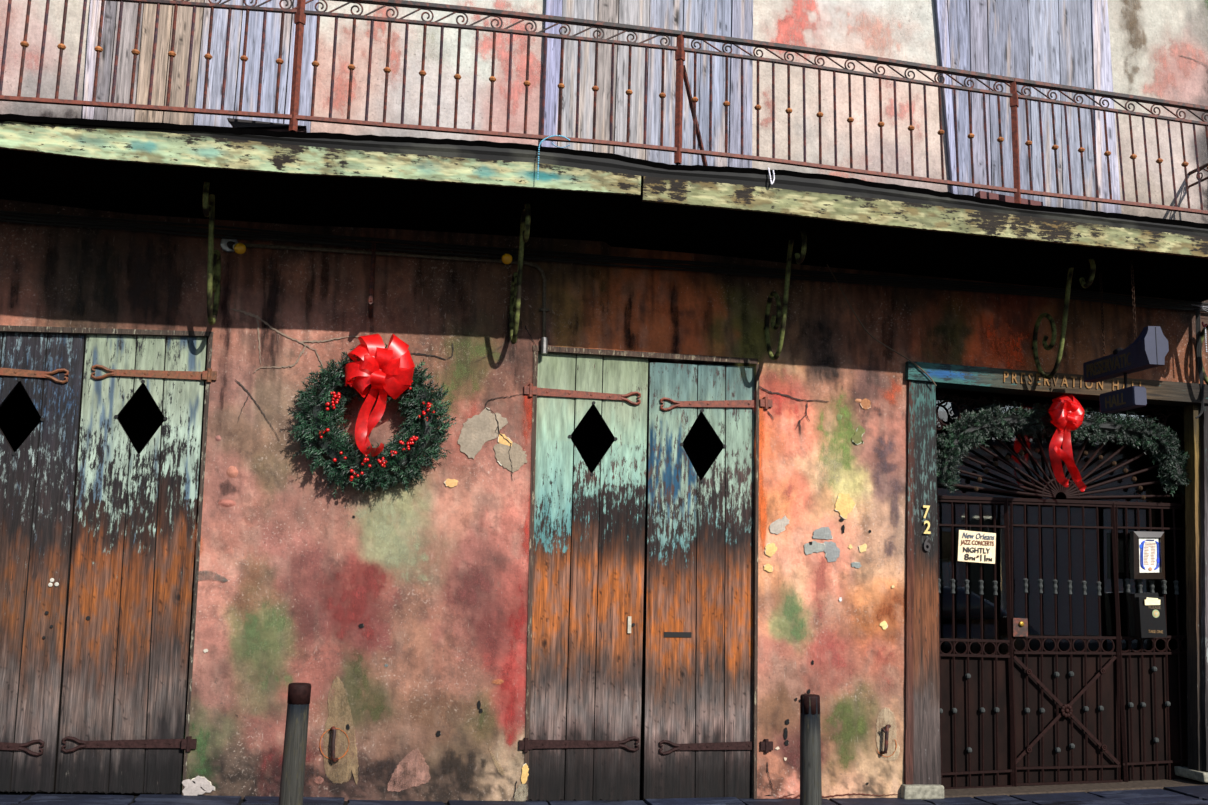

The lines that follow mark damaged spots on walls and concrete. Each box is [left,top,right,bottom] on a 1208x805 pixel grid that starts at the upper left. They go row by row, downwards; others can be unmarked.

water stain [1122,0,1146,48]
water stain [1125,44,1205,97]
water stain [221,268,231,347]
water stain [261,257,283,365]
water stain [625,297,635,350]
water stain [670,288,679,354]
crack [759,386,829,435]
flaking render [764,530,784,572]
flaking render [821,493,867,557]